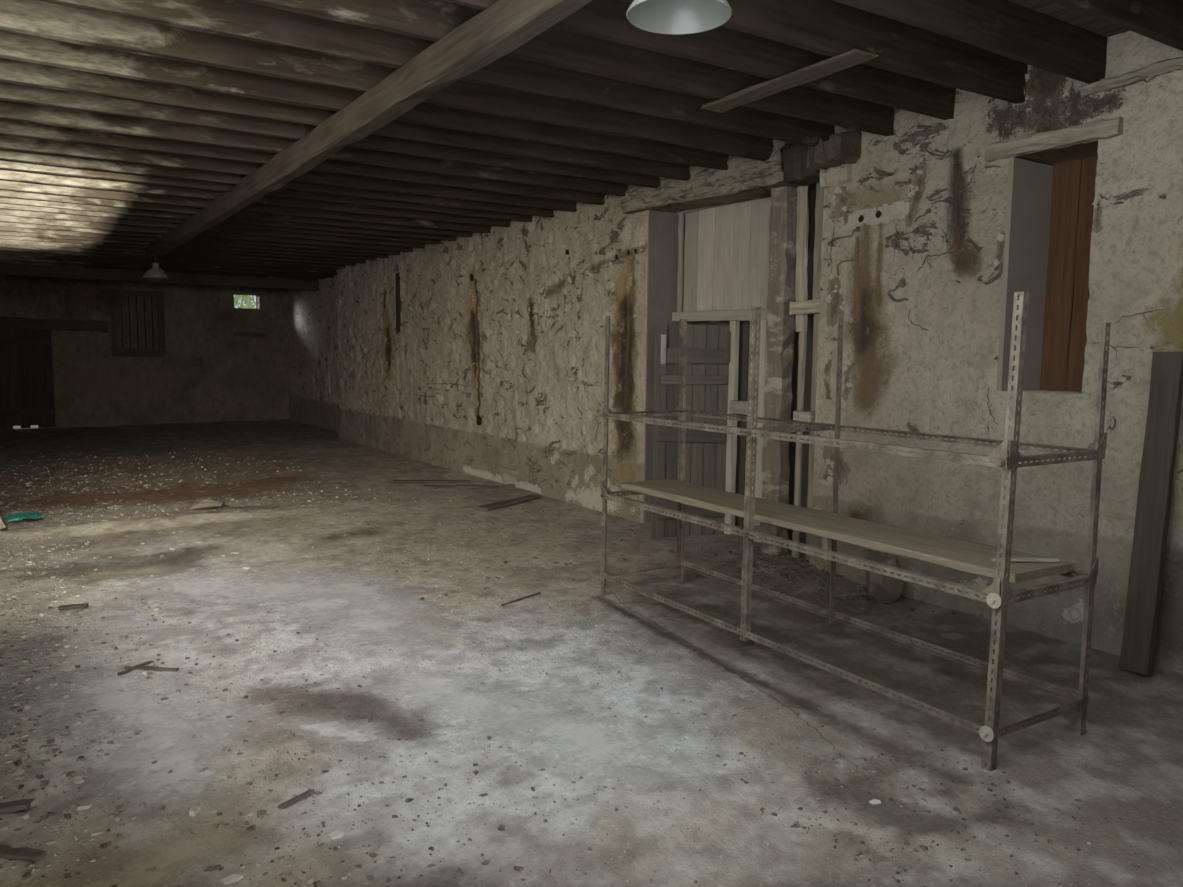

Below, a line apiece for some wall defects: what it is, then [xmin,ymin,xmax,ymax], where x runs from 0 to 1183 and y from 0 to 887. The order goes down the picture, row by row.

crack [1080,69,1183,121]
spalling [829,157,926,234]
spalling [993,231,1005,267]
corrosion [467,272,480,415]
corrosion [851,223,889,416]
damp [1150,282,1183,352]
corrosion [613,255,637,521]